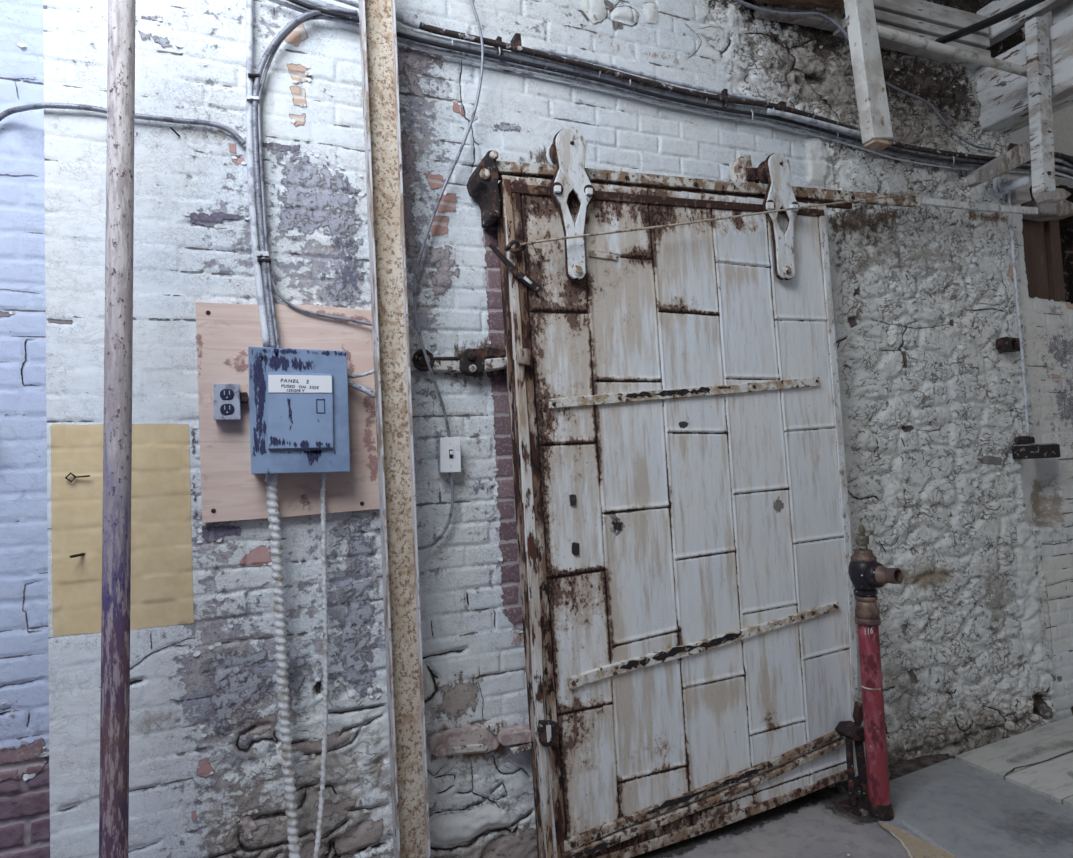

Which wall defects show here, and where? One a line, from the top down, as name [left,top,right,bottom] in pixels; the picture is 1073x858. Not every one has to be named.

flaking render [604,0,623,30]
rust [520,146,548,164]
peeling [262,138,366,308]
crack [872,272,1011,377]
crack [848,477,907,511]
water stain [1031,480,1064,525]
peeling [193,512,382,777]
spalling [427,672,483,725]
crack [235,705,384,755]
spalling [234,809,258,840]
crack [209,783,386,858]
spalling [285,797,384,858]